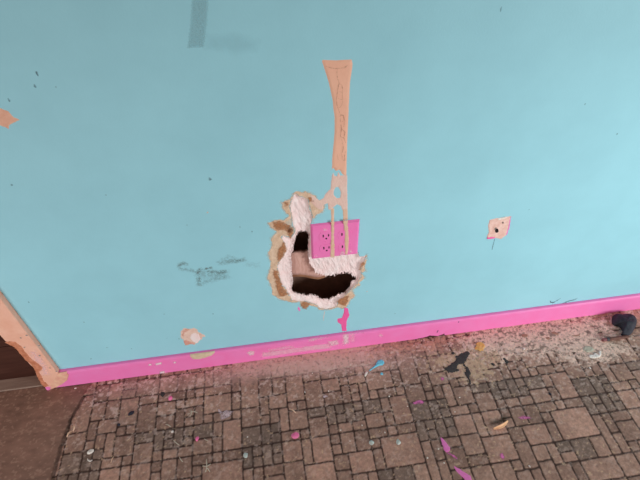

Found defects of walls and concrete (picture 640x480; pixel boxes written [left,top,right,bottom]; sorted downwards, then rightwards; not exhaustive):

peeling [0,108,19,129]
peeling [487,216,511,239]
spalling [267,191,368,310]
peeling [180,328,205,345]
peeling [5,341,69,390]